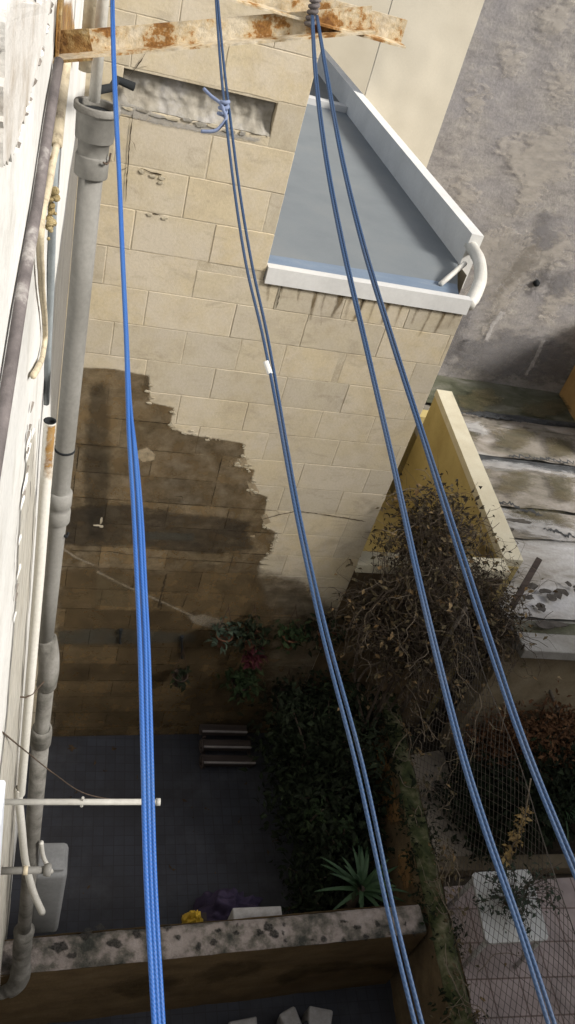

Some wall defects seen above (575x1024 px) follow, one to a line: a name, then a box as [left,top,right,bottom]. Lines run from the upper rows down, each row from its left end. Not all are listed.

rust [56,2,75,44]
crack [73,550,264,607]
leakage [51,368,333,737]